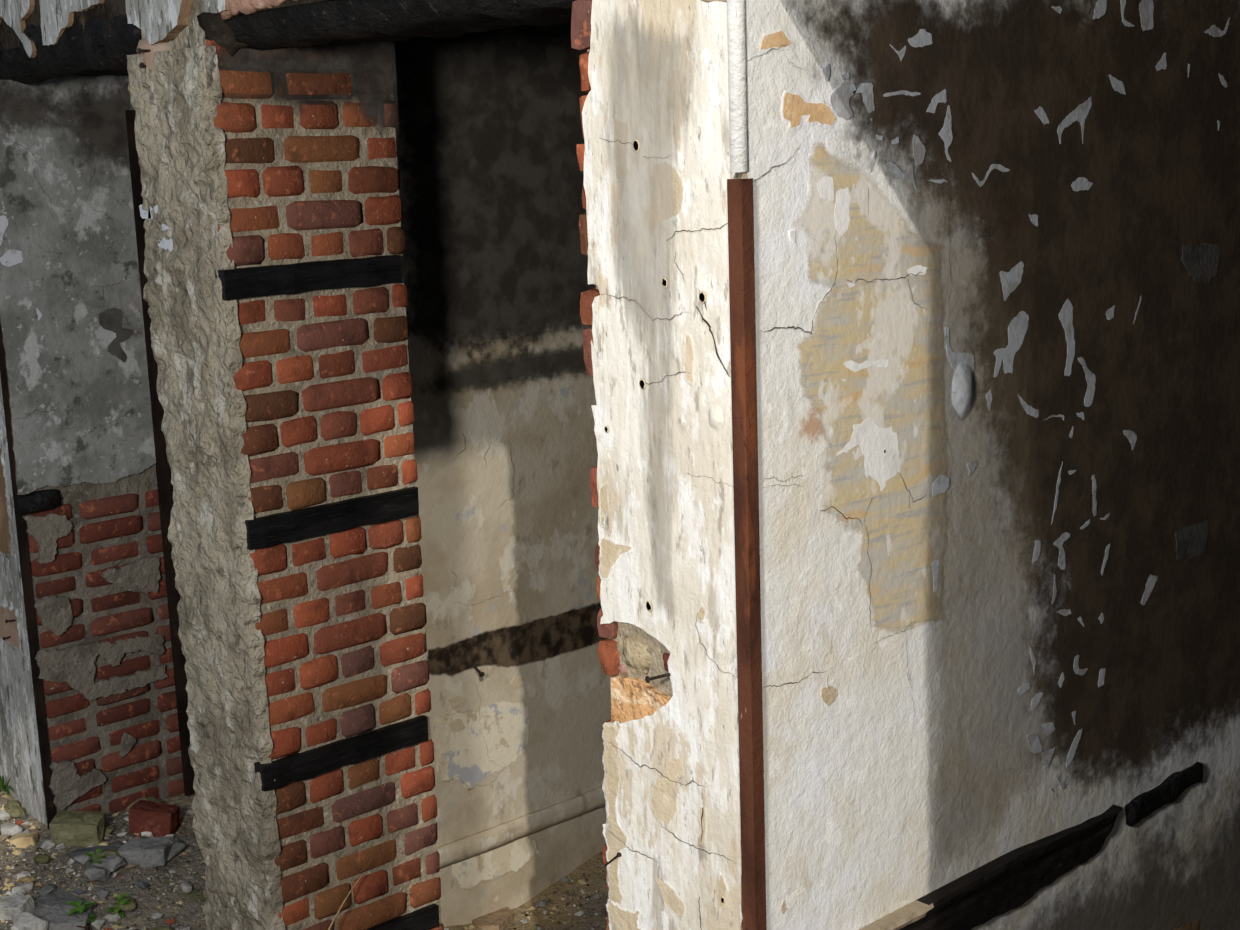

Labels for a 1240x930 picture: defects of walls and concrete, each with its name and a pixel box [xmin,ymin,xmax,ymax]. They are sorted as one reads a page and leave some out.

peeling [890,29,932,61]
spalling [571,0,592,255]
peeling [780,64,953,162]
crack [668,223,728,275]
peeling [1000,261,1024,301]
peeling [98,308,134,362]
spalling [580,287,600,376]
crack [601,294,730,377]
peeling [789,135,975,631]
peeling [986,311,1029,411]
flaking render [0,428,184,813]
peeling [590,466,671,930]